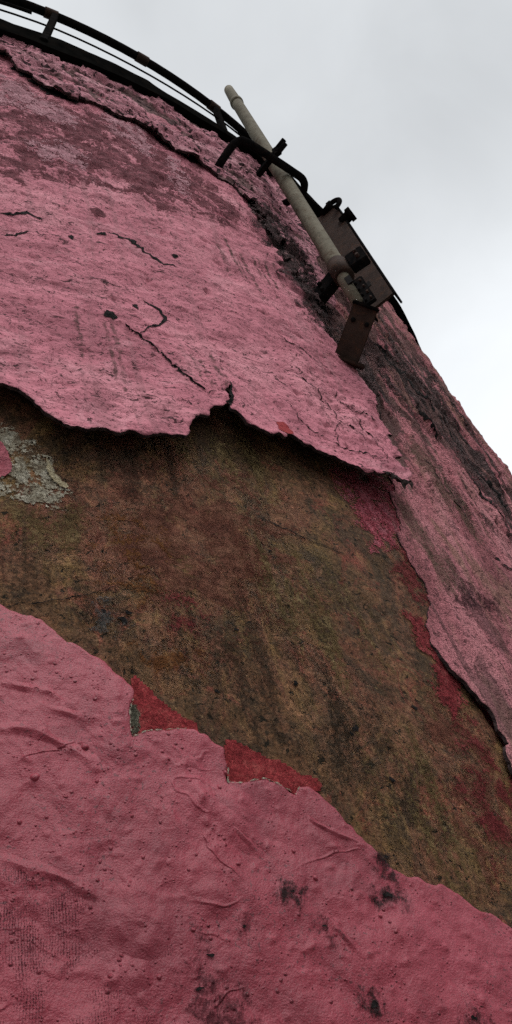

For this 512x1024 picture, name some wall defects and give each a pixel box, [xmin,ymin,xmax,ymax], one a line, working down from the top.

peeling [0,67,252,230]
crack [109,232,176,267]
crack [125,300,234,405]
spalling [0,386,512,928]